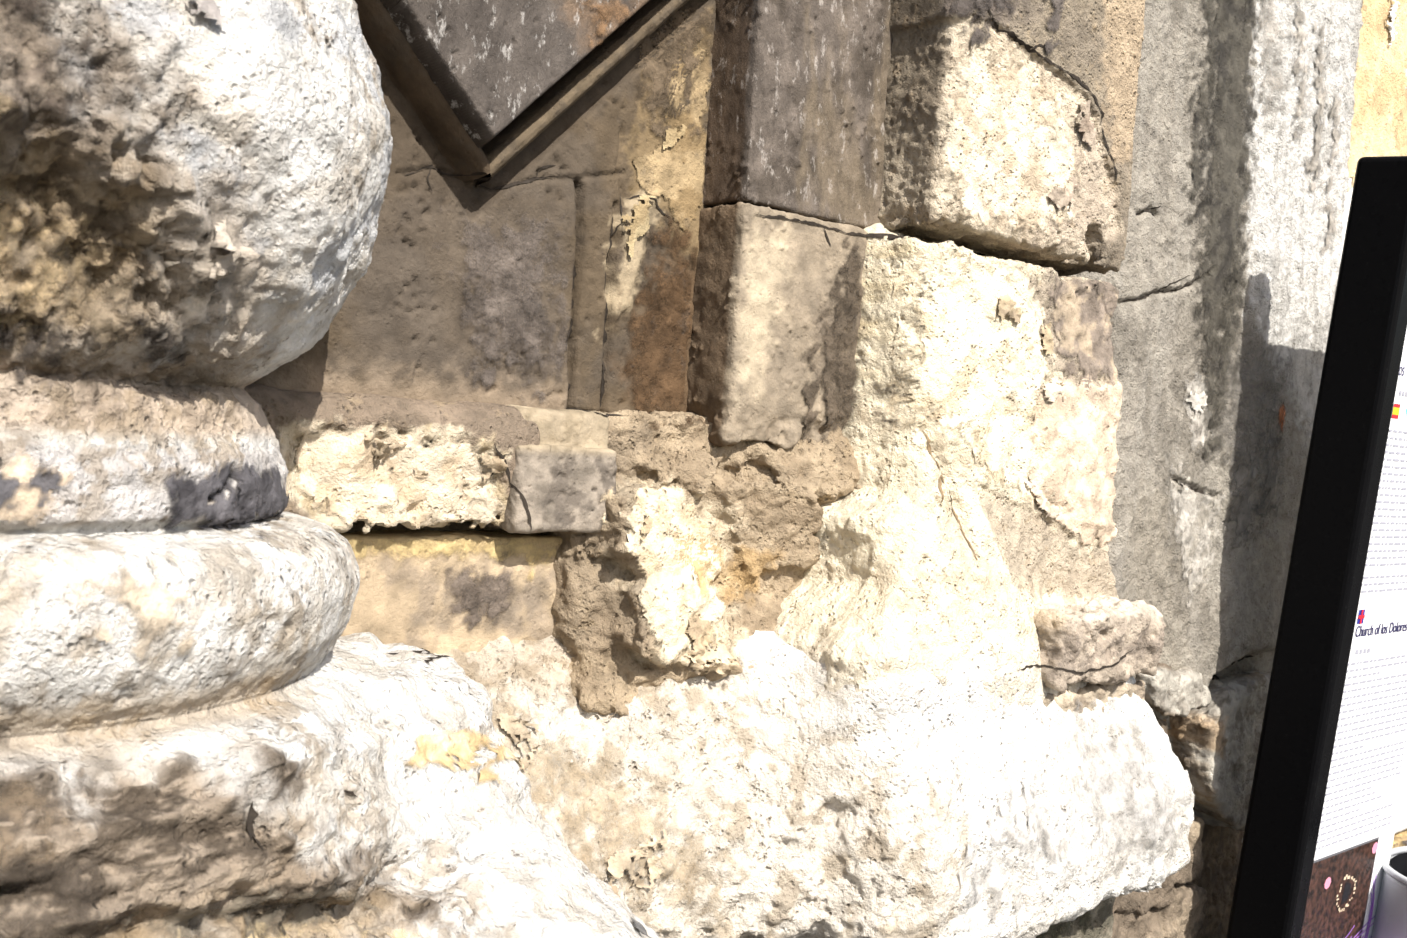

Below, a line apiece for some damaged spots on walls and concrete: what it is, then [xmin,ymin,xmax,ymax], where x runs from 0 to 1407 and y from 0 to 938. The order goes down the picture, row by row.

spalling [191,0,228,26]
spalling [0,206,138,358]
spalling [147,200,261,328]
crack [1121,272,1207,302]
damp [0,454,62,509]
damp [165,462,289,538]
spalling [538,409,862,718]
crack [1018,651,1131,686]